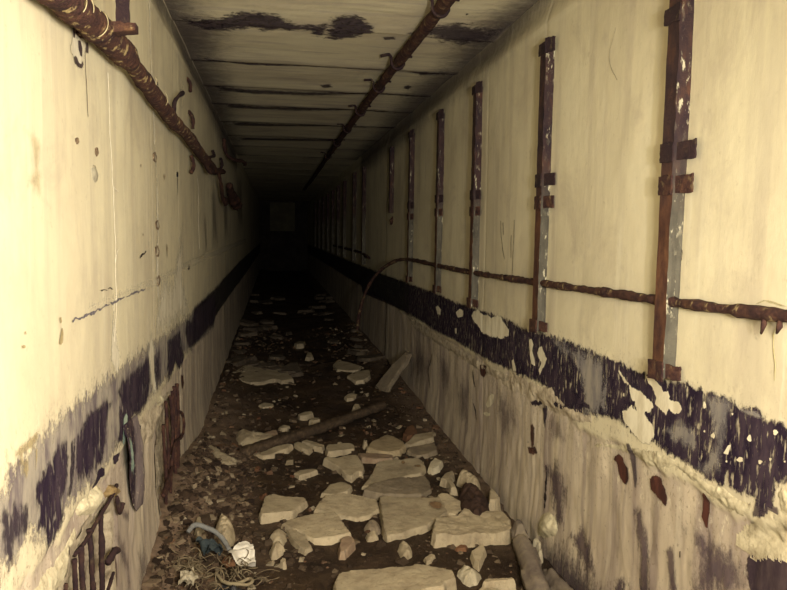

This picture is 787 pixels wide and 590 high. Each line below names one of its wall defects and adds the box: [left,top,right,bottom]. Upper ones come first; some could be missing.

water stain [190,11,375,40]
water stain [429,14,487,44]
rust [760,319,783,334]
water stain [556,338,607,416]
rust [614,454,628,484]
spalling [58,414,145,590]
rust [650,475,667,506]
rust [702,493,710,528]
water stain [634,510,649,590]
water stain [667,548,677,590]
water stain [694,535,740,590]
spalling [736,509,787,590]